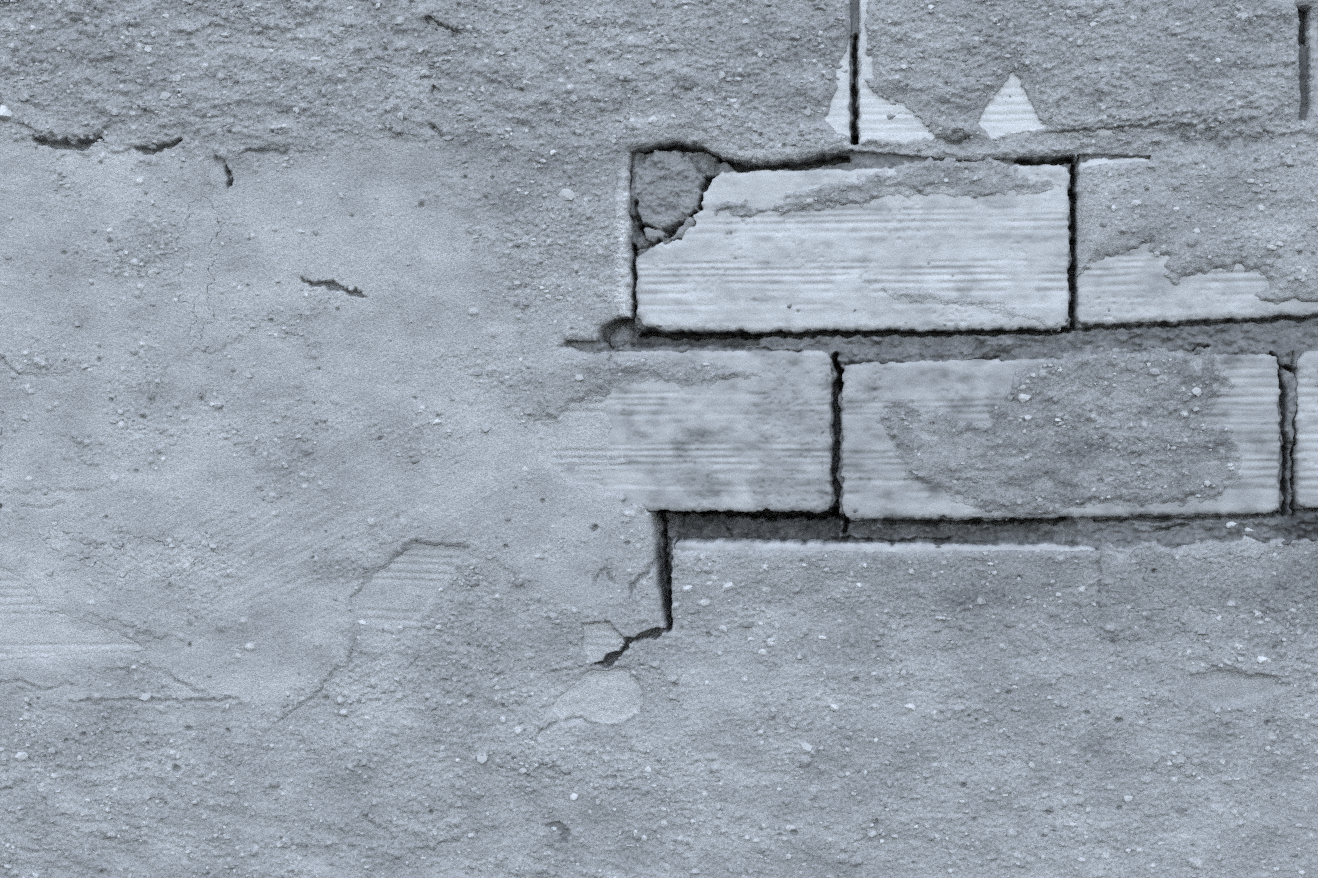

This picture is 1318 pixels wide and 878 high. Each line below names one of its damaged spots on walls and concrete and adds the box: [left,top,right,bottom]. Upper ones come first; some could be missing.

spalling [613,0,935,318]
spalling [978,72,1047,140]
spalling [1257,0,1318,118]
spalling [535,397,628,492]
crack [590,510,679,669]